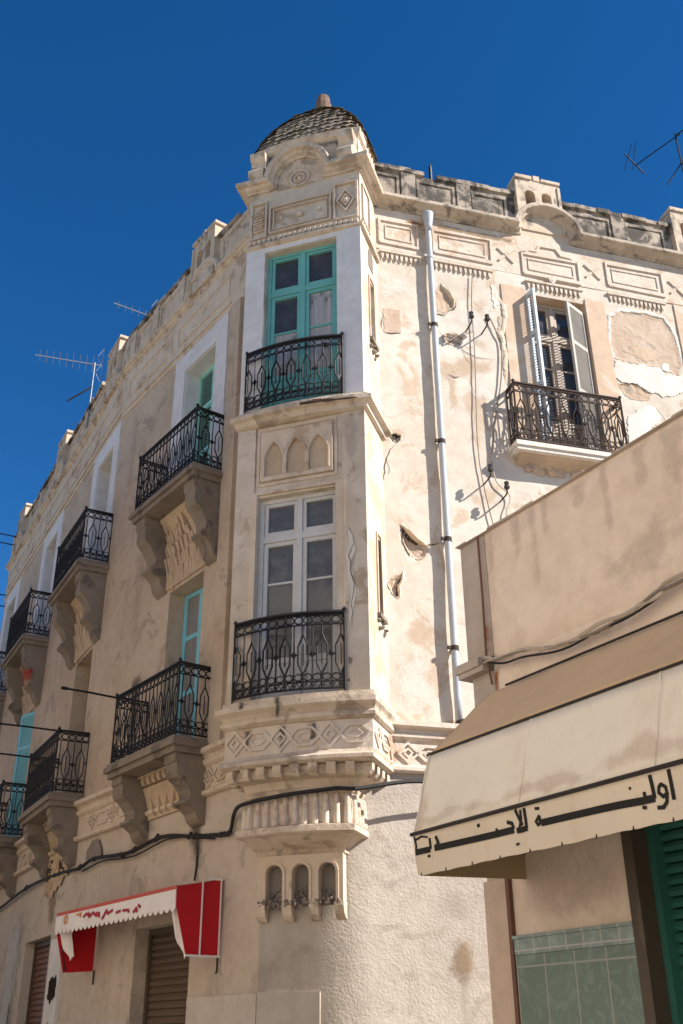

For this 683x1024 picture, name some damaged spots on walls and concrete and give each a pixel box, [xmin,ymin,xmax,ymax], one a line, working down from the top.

flaking render [435,284,482,345]
peeling [607,308,683,443]
flaking render [400,523,438,560]
flaking render [388,571,405,600]